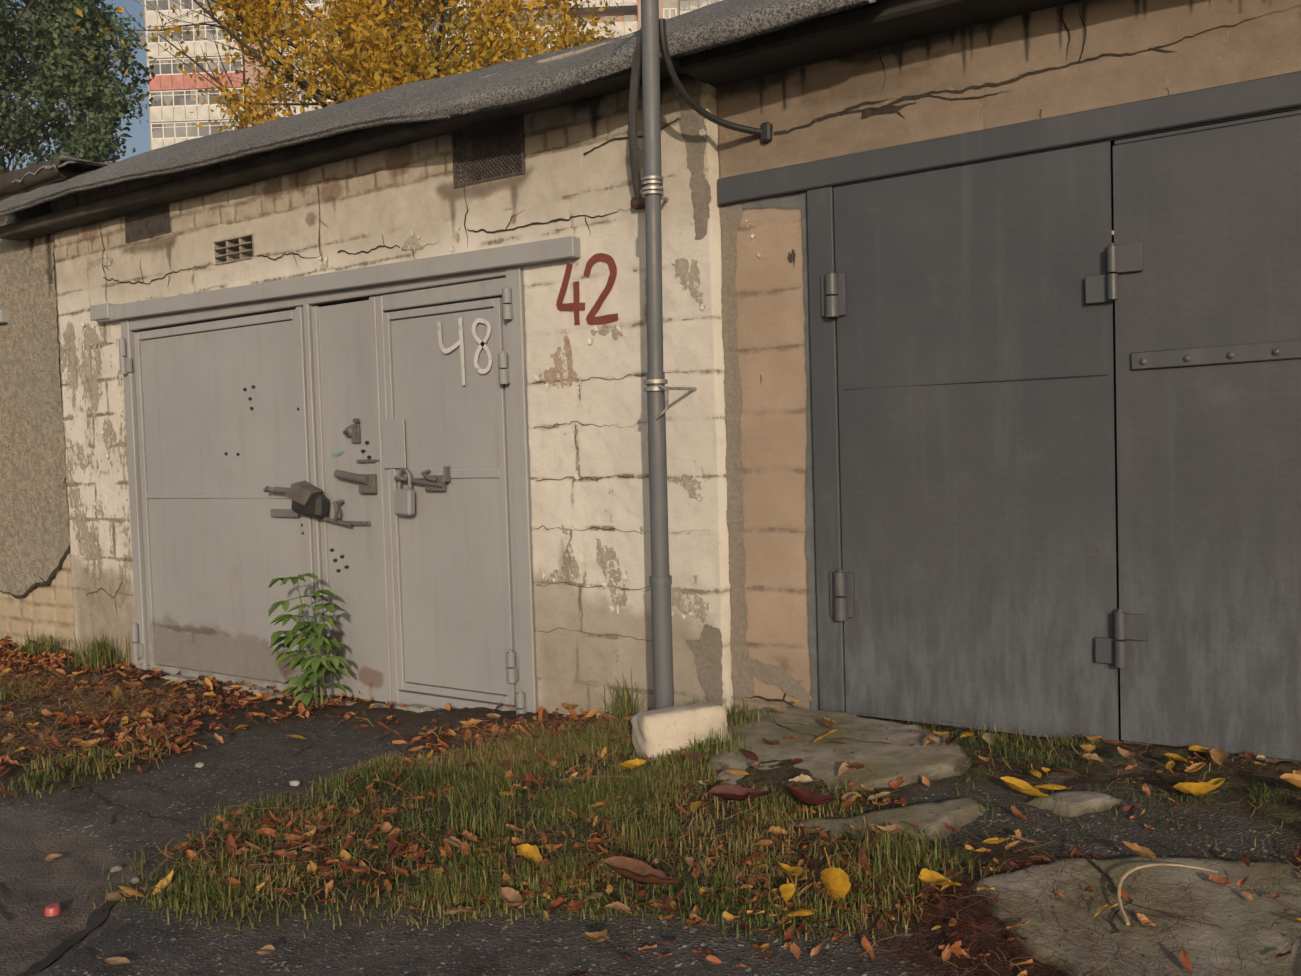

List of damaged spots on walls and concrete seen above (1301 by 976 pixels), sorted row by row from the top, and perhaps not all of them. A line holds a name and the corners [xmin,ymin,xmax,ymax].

leakage [719,14,1030,111]
crack [774,5,1300,135]
crack [257,187,436,269]
crack [464,198,631,247]
crack [0,234,70,613]
peeling [66,322,116,458]
flaking render [0,441,104,654]
crack [86,557,126,618]
peeling [543,525,579,582]
peeling [596,538,628,614]
peeling [671,587,709,623]